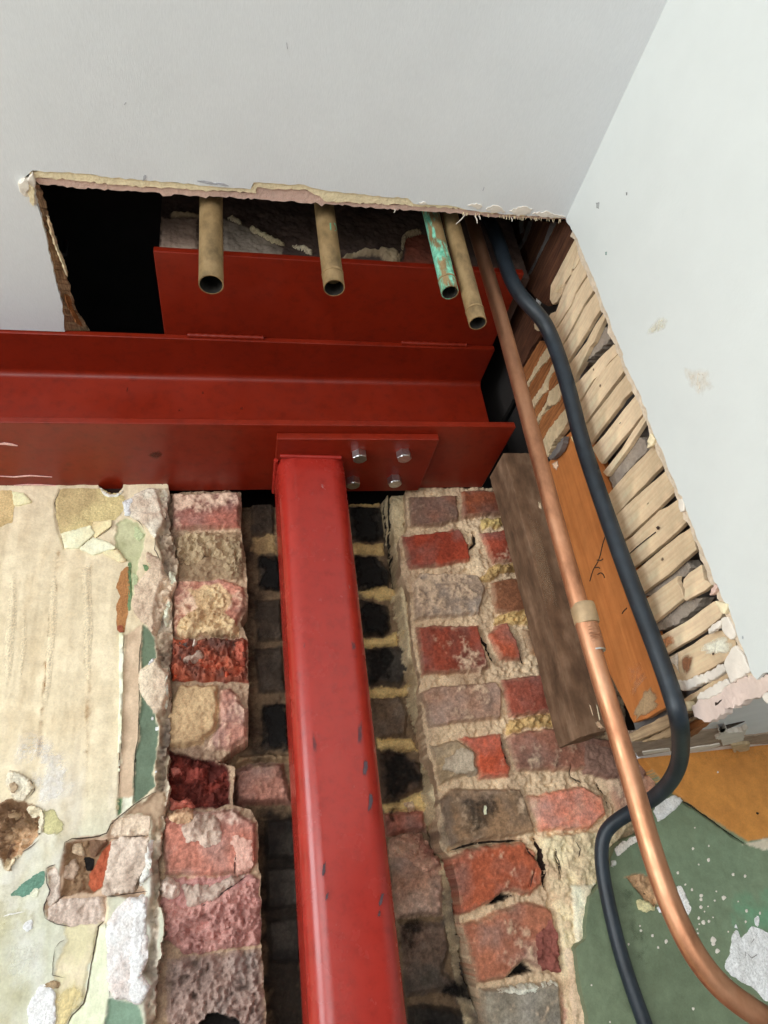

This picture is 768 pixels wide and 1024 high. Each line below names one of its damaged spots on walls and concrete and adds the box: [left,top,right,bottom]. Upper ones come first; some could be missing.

peeling [12,491,32,506]
spalling [570,231,768,753]
spalling [61,488,247,731]
spalling [11,814,261,1005]
crack [429,836,581,888]